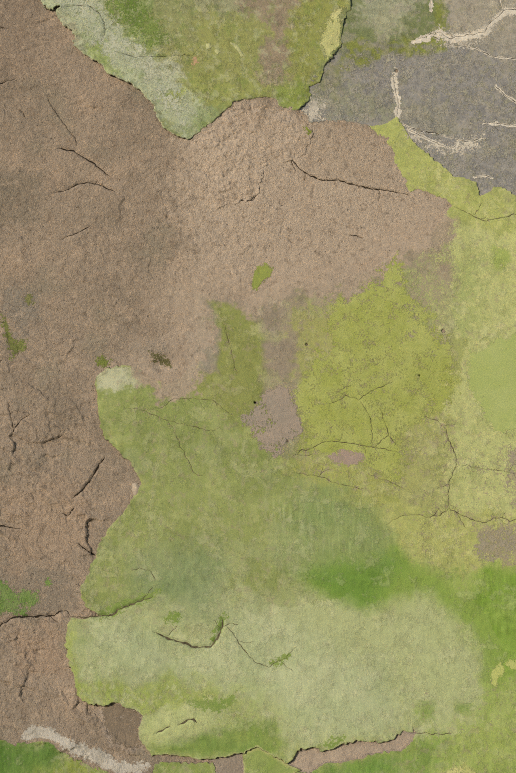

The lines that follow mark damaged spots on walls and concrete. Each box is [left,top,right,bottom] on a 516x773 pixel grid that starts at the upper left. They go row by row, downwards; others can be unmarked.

crack [410,0,516,60]
crack [47,96,115,192]
peeling [41,0,351,210]
crack [291,161,408,201]
crack [389,67,516,150]
peeling [240,251,462,488]
crack [63,457,105,516]
crack [292,381,400,489]
crack [394,416,516,527]
crack [0,568,154,626]
spalling [102,703,144,750]